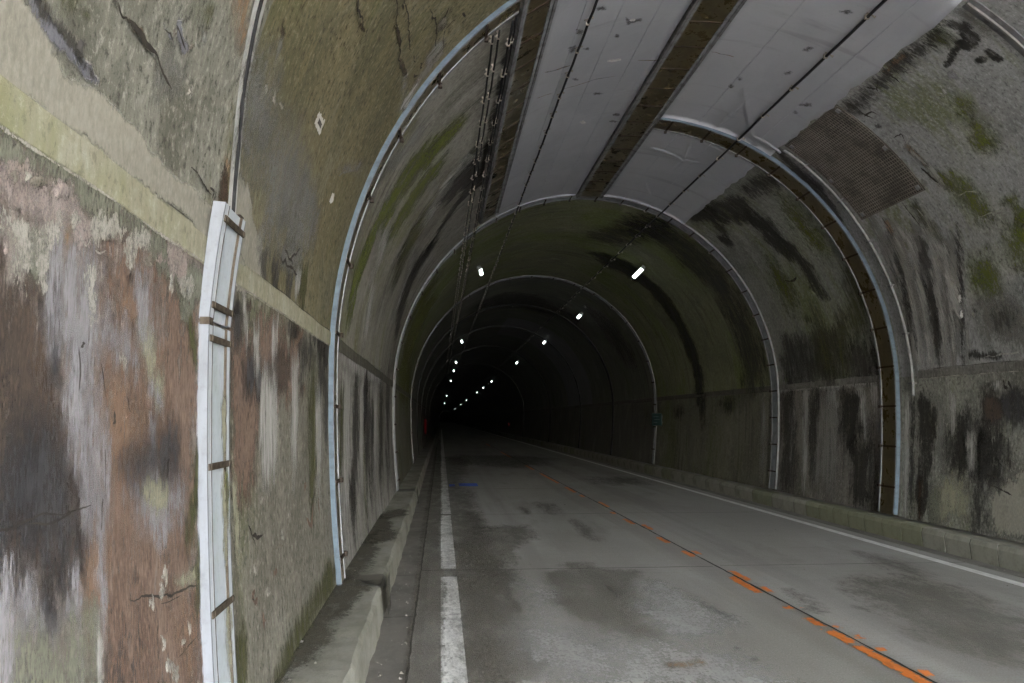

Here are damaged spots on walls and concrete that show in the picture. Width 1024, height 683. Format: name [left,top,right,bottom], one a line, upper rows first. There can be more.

damp [0,214,200,683]
crack [118,2,183,105]
crack [191,167,215,206]
crack [357,0,365,32]
damp [232,41,510,683]
crack [394,0,466,111]
damp [689,173,880,511]
damp [867,216,1024,539]